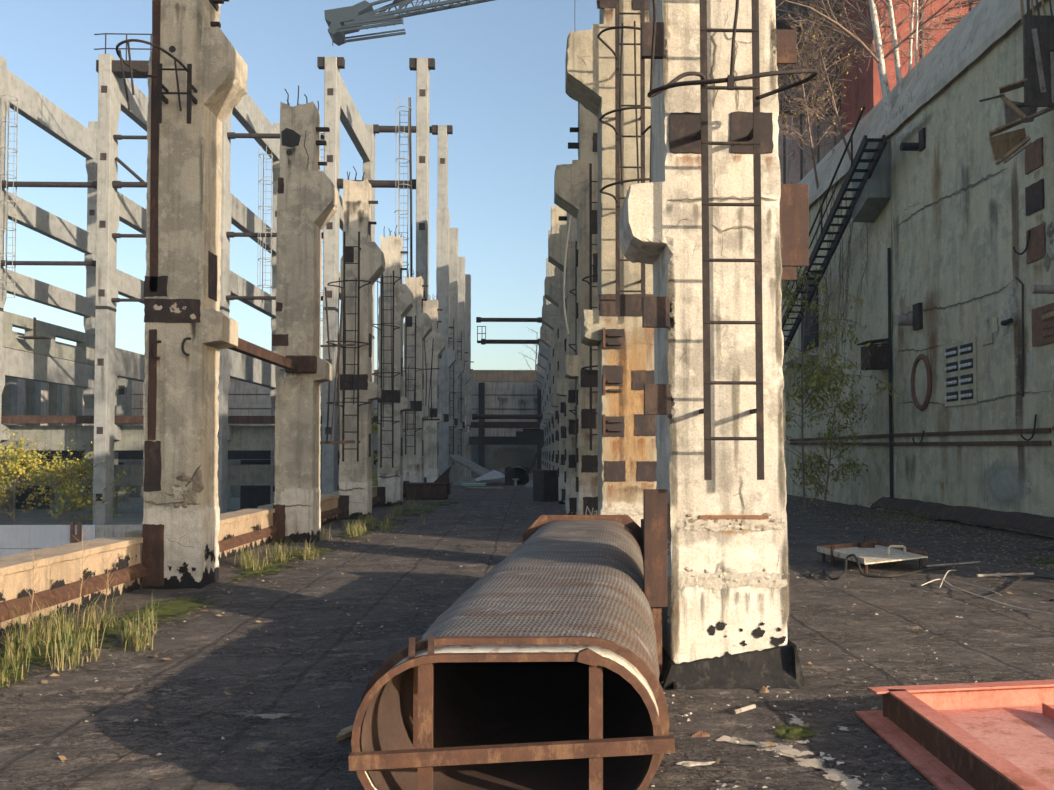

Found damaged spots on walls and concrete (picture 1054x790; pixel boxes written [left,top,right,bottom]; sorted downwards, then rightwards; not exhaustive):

crack [667,168,776,282]
peeling [153,302,196,319]
spalling [166,469,204,508]